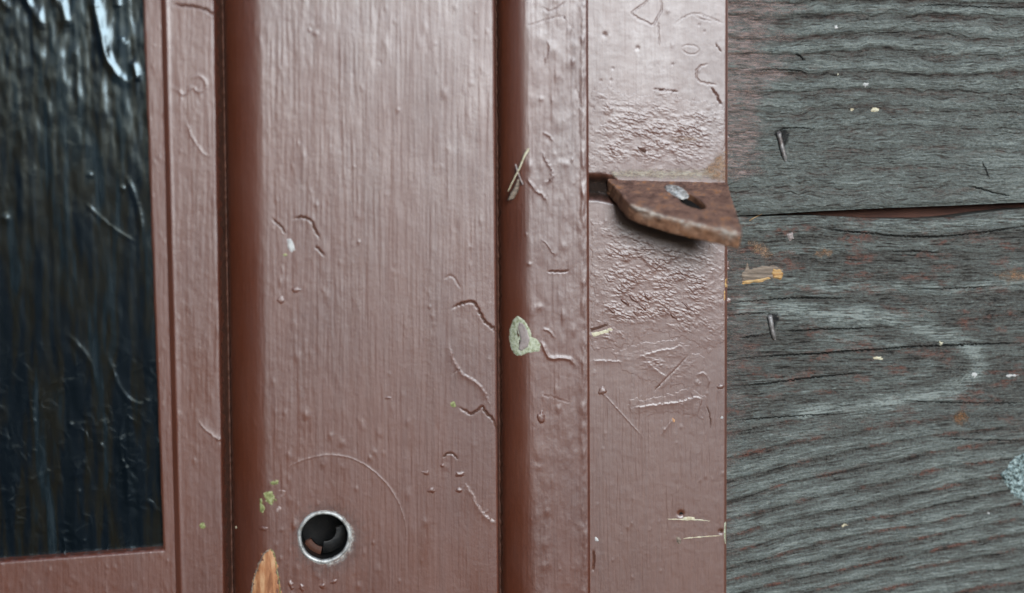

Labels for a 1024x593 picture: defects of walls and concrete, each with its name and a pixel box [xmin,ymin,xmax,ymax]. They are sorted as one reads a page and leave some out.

crack [444,275,496,331]
peeling [509,316,541,356]
peeling [251,549,282,593]